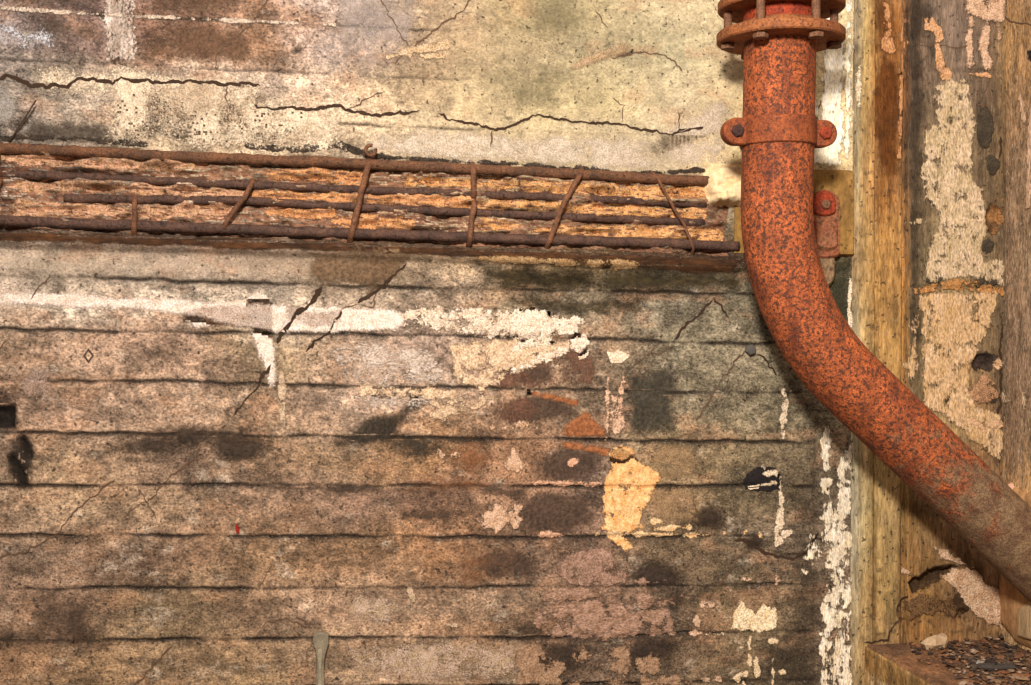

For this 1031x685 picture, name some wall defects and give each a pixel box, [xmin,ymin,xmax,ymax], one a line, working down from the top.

crack [0,0,703,146]
crack [233,287,322,416]
crack [306,264,406,352]
spalling [0,99,732,256]
corrosion [0,231,736,273]
peeling [902,0,1027,460]
corrosion [532,391,610,456]
peeling [324,303,701,685]
peeling [705,601,786,685]
peeling [743,464,793,548]
peeling [800,426,853,685]
spalling [896,546,1002,629]